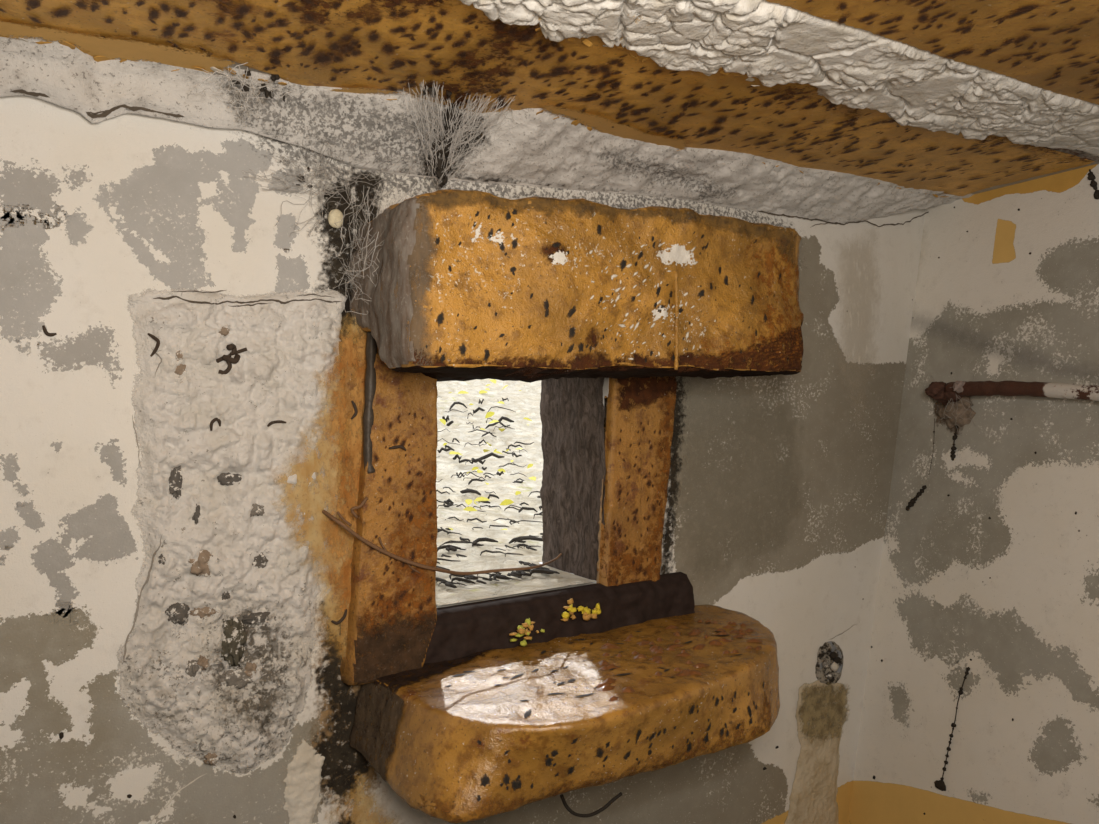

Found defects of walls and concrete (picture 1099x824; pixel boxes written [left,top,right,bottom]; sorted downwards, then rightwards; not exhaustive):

peeling [0,21,287,86]
spalling [460,0,1099,157]
peeling [590,242,700,360]
corrosion [407,190,804,586]
spalling [0,137,346,824]
peeling [670,235,1099,713]
corrosion [278,318,437,824]
damp [315,623,369,824]
corrosion [417,682,771,822]
peeling [455,742,788,824]
corrosion [494,619,762,701]
peeling [1027,716,1087,776]